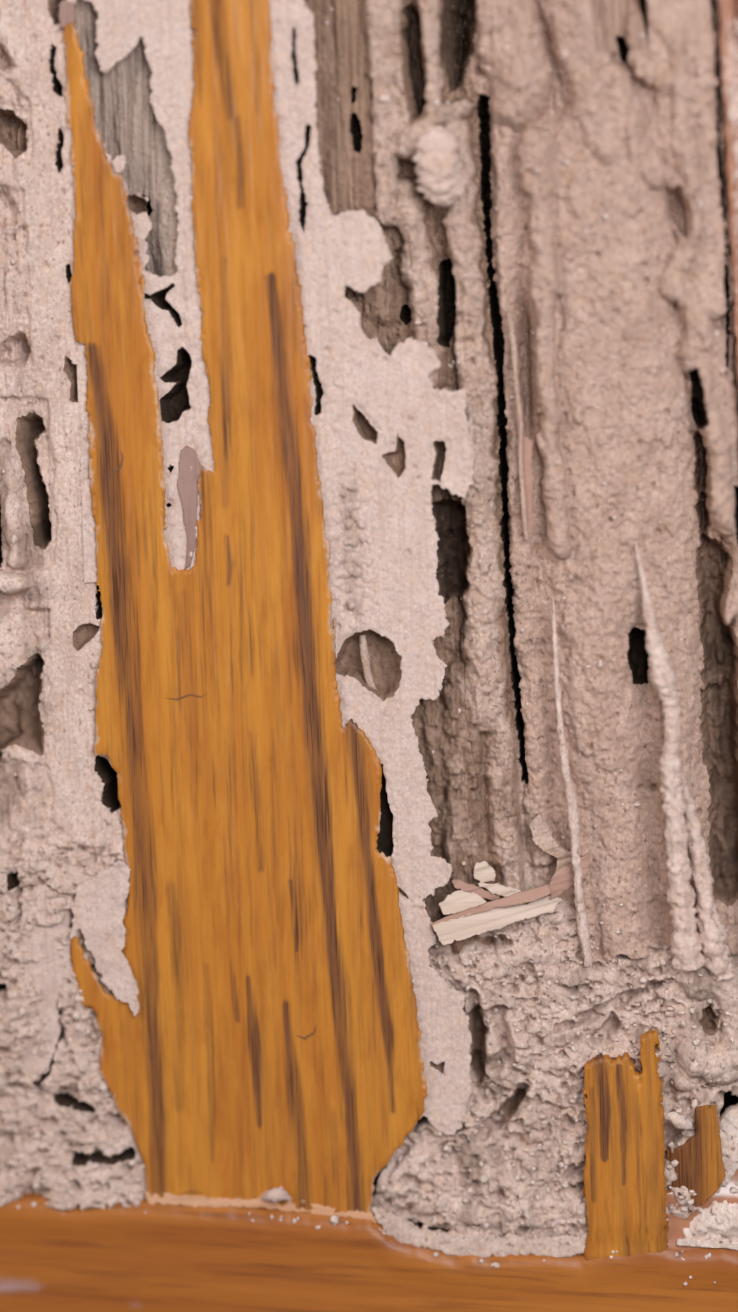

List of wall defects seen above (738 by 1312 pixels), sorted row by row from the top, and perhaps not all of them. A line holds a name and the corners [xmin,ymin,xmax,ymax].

peeling [66,0,214,583]
peeling [268,0,490,1136]
crack [477,94,529,784]
peeling [17,860,140,1081]
peeling [582,1029,726,1260]